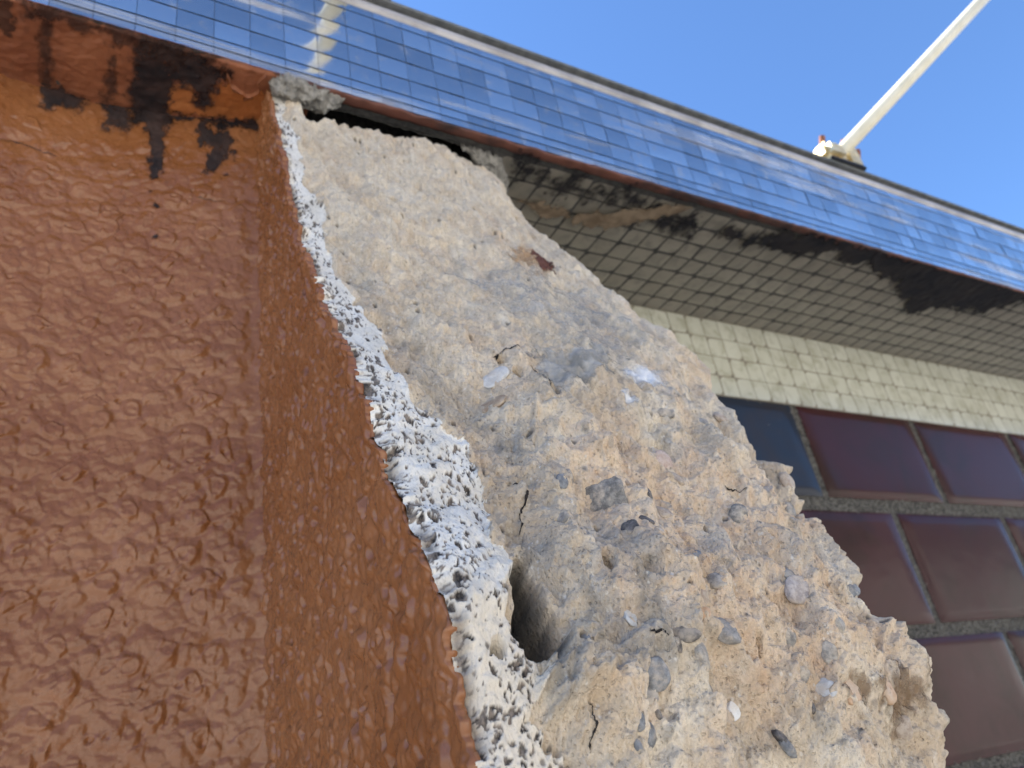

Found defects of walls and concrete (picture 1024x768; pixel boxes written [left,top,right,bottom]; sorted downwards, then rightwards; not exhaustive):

water stain [0,0,17,38]
water stain [36,5,259,208]
rust [511,247,556,274]
water stain [718,225,1024,316]
spalling [167,70,950,768]
crack [513,483,529,535]